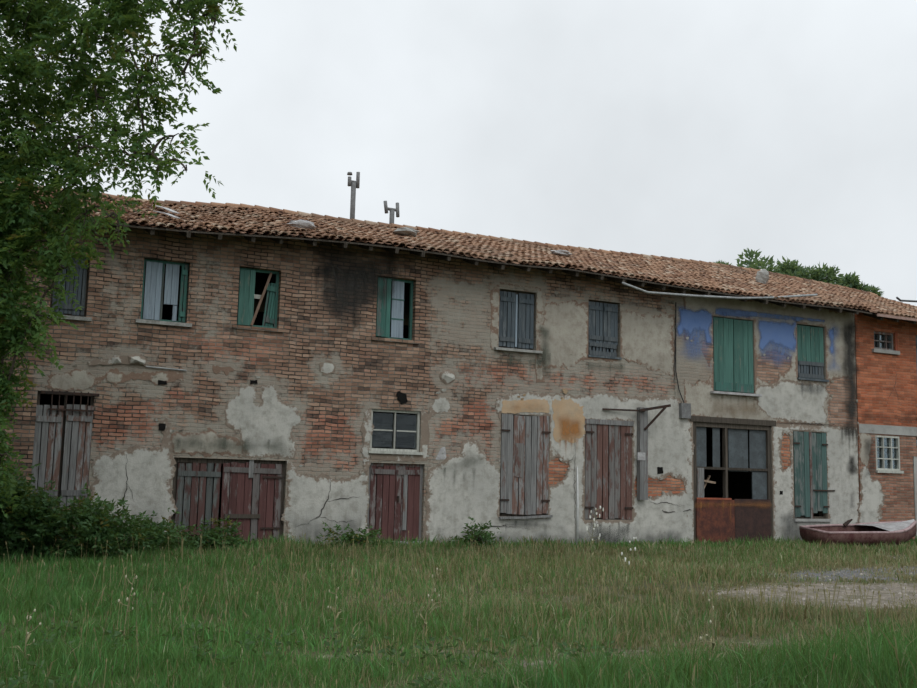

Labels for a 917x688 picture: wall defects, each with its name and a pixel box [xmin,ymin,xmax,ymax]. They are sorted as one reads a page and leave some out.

flaking render [45,360,184,391]
flaking render [87,282,859,545]
crack [299,478,358,526]